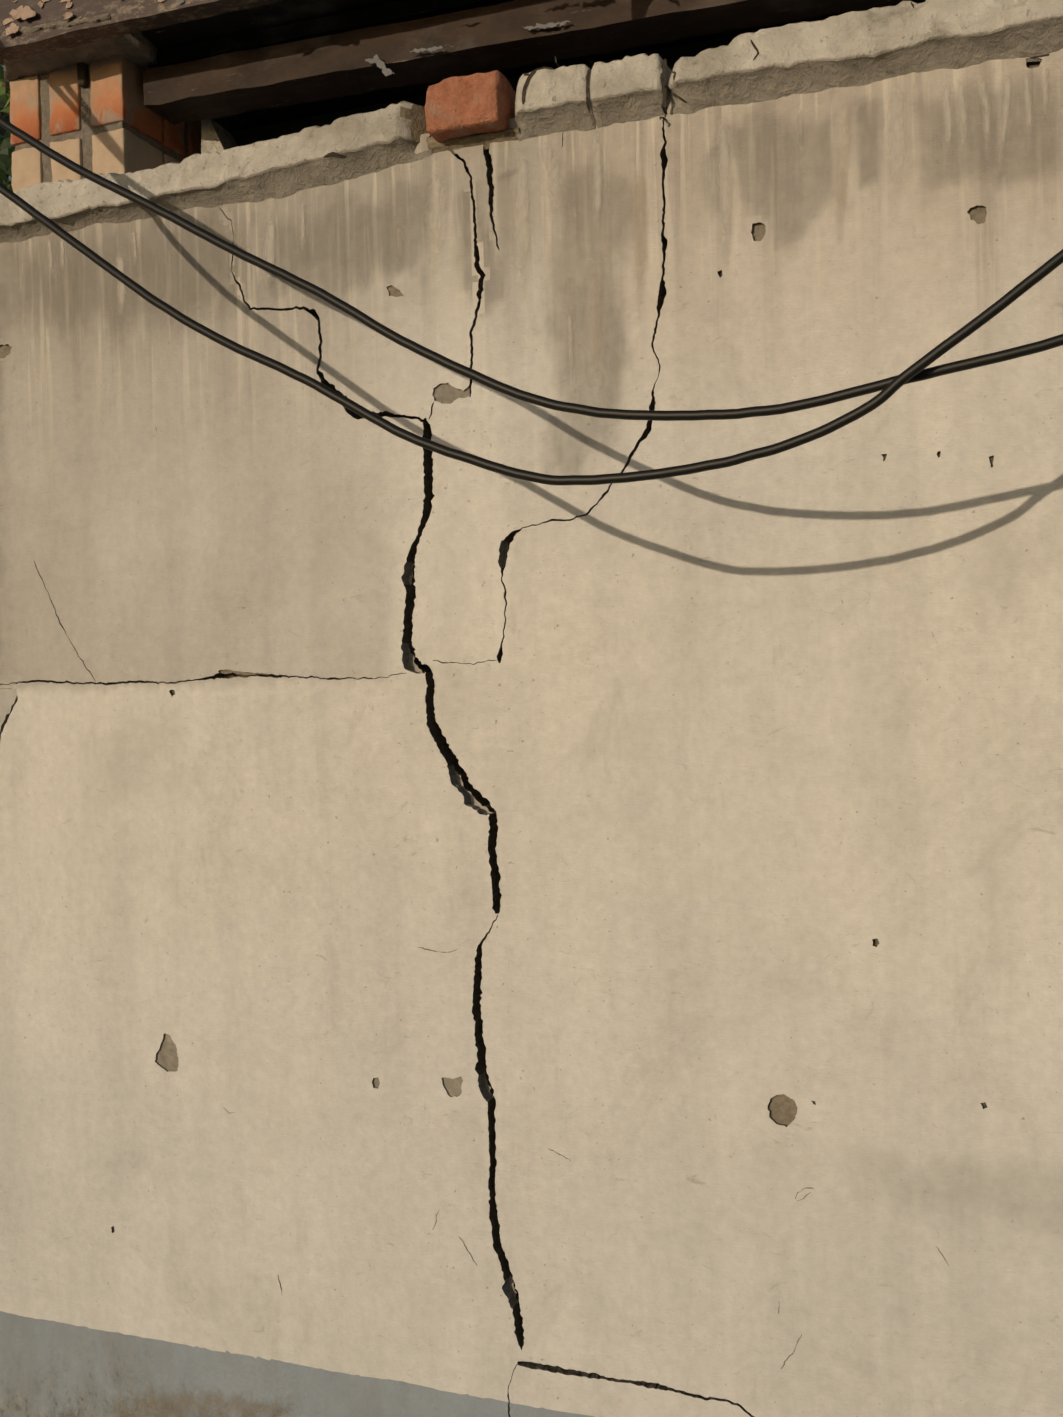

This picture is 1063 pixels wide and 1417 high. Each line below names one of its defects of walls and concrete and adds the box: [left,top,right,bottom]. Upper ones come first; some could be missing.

peeling [3,0,83,36]
water stain [118,236,136,303]
peeling [0,688,18,741]
crack [0,56,754,1417]
spalling [155,1033,179,1072]
spalling [441,1077,463,1097]
spalling [767,1094,816,1127]